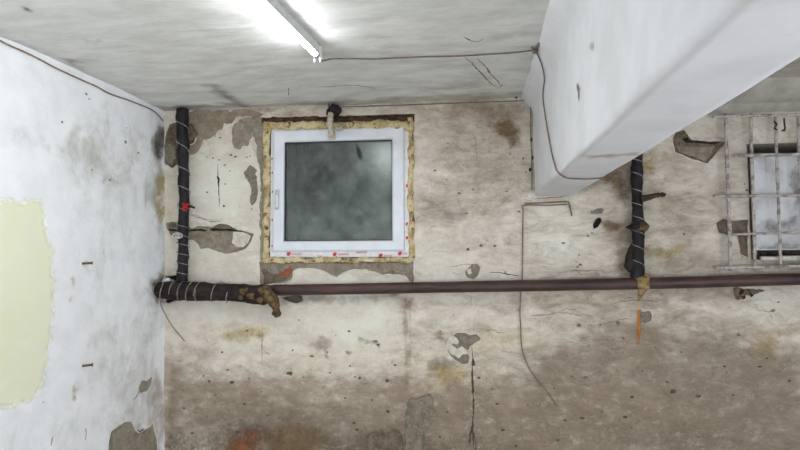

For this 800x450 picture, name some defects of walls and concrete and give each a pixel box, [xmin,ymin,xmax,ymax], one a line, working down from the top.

crack [464,37,505,88]
leakage [154,127,165,158]
spalling [164,123,178,168]
leakage [496,118,518,146]
spalling [672,129,724,164]
spalling [188,109,415,285]
spalling [166,222,178,241]
spalling [717,219,748,257]
peeling [446,332,481,365]
crack [469,352,477,450]
spalling [109,421,158,450]
spalling [366,394,437,450]